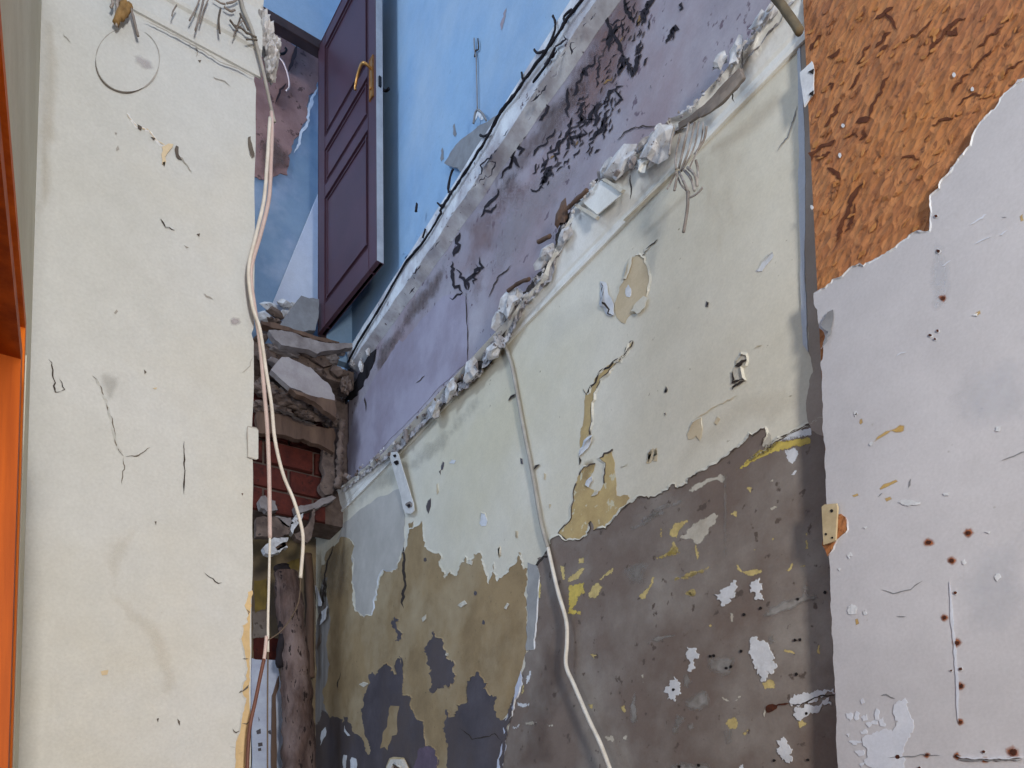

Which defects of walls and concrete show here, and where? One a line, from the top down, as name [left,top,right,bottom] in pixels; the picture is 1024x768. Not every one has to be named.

crack [481,0,683,216]
spalling [807,6,965,200]
spalling [925,15,1023,142]
spalling [837,180,865,240]
crack [450,233,511,361]
peeling [599,253,652,323]
crack [51,362,65,392]
flaking render [343,245,565,491]
crack [583,342,631,395]
crack [180,445,188,490]
crack [400,547,408,608]
peeling [315,341,849,768]